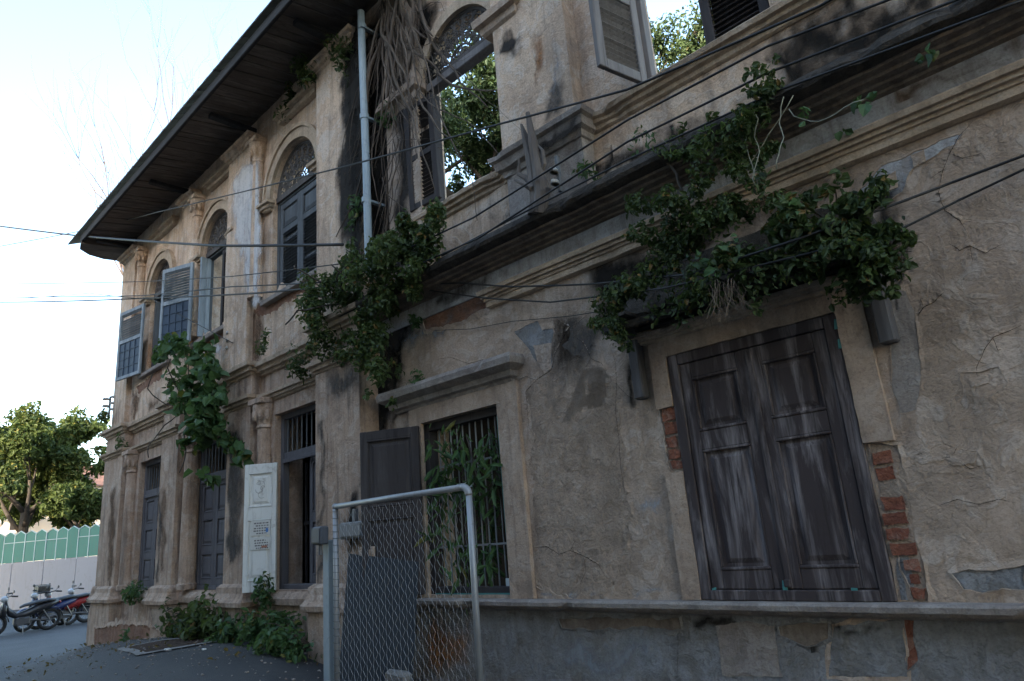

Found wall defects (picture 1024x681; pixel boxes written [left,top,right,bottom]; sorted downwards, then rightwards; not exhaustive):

leakage [419,3,438,96]
leakage [337,6,409,257]
peeling [855,132,966,208]
crack [930,122,1000,262]
leakage [590,224,730,298]
flaking render [421,298,501,337]
leakage [557,312,606,365]
leakage [227,433,242,562]
flaking render [514,314,635,599]
flaking render [659,407,683,473]
flaking render [867,441,936,602]
flaking render [946,559,1024,603]